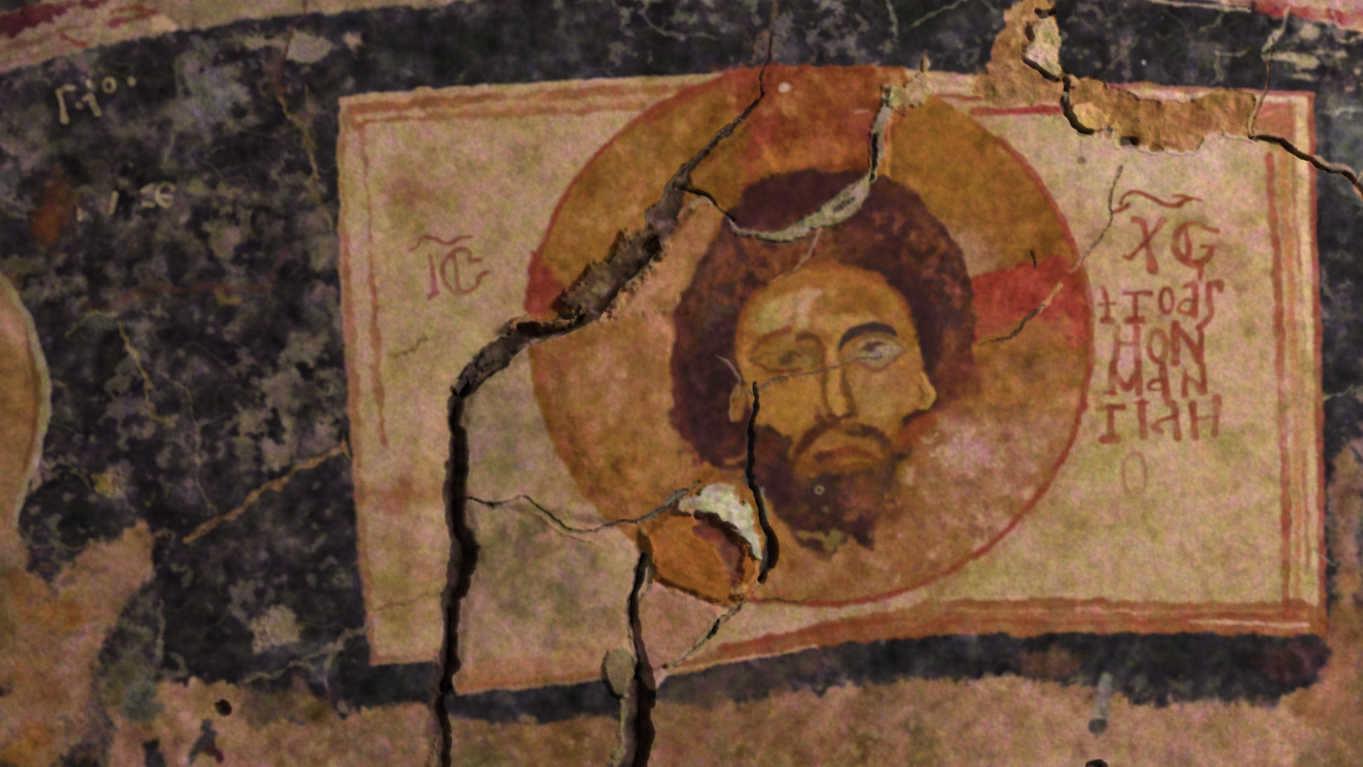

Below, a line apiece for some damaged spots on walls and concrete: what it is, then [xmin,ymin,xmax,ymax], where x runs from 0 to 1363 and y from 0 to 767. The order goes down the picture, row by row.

peeling [777,81,794,94]
spalling [966,0,1256,165]
crack [1097,0,1363,203]
crack [242,0,1001,767]
crack [1321,383,1356,402]
flaking render [642,479,763,611]